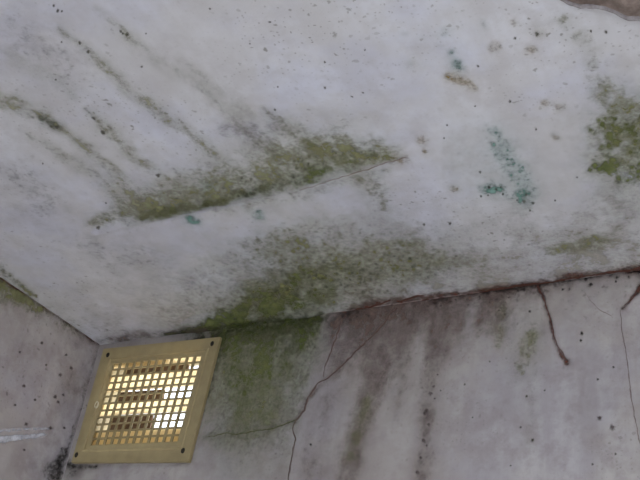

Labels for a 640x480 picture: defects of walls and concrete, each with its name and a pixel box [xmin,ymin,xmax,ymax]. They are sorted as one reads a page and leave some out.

crack [208,308,397,480]
damp [327,270,465,392]
crack [585,293,640,443]